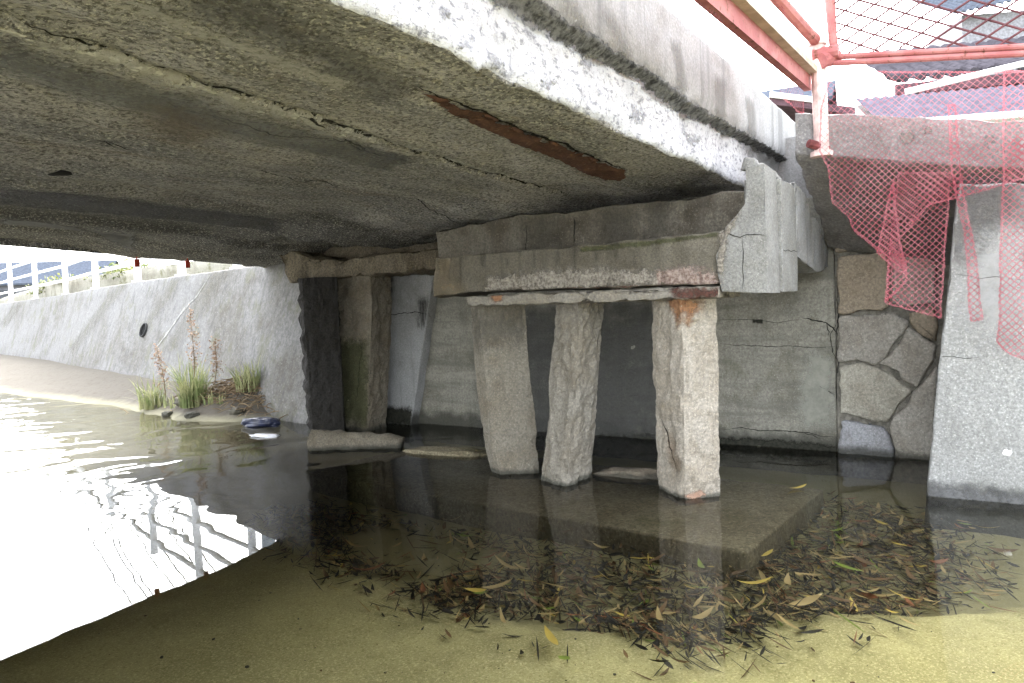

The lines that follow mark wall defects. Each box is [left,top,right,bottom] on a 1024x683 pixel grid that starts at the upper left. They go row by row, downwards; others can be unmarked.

crack [0,10,566,193]
rust [411,84,628,181]
rust [669,286,718,326]
crack [724,233,761,283]
crack [719,288,839,395]